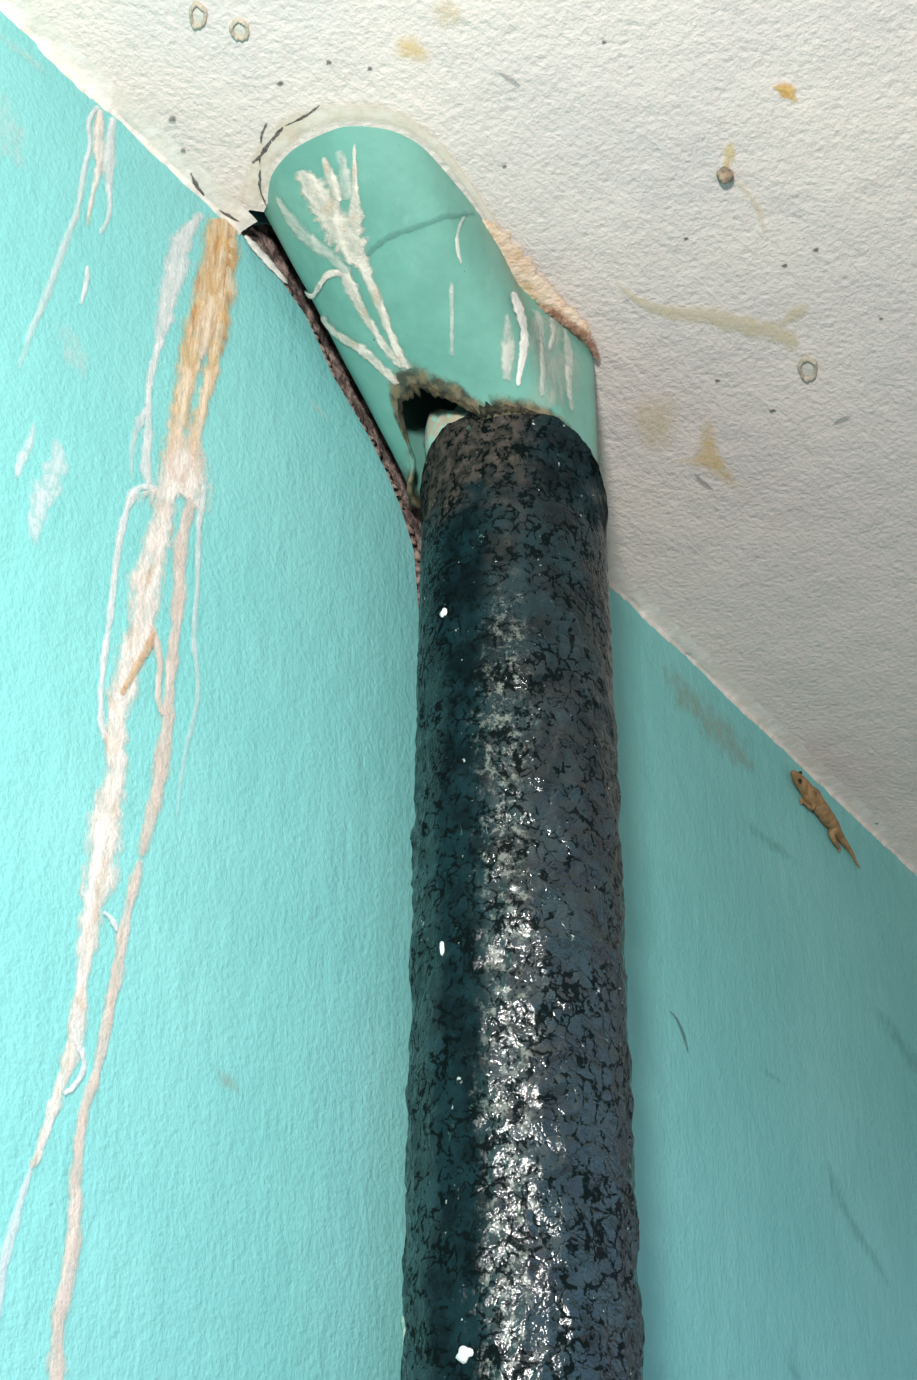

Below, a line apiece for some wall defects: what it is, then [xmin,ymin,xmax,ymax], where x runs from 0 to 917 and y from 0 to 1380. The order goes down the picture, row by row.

water stain [70,106,116,229]
water stain [81,266,90,302]
flaking render [241,105,600,362]
water stain [455,217,465,262]
water stain [501,292,573,410]
water stain [15,427,33,475]
water stain [29,447,65,535]
rust [0,213,238,1380]